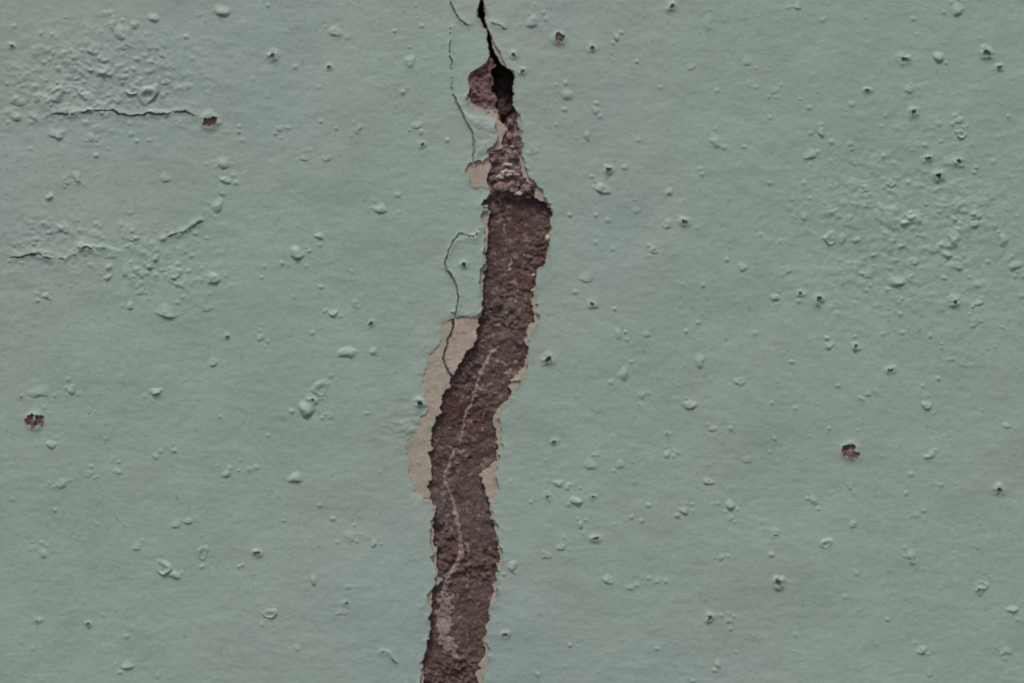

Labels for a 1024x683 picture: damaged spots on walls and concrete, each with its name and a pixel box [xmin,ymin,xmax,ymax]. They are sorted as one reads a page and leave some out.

crack [53,109,194,117]
rust [203,116,218,127]
peeling [465,157,491,189]
crack [10,246,92,260]
crack [392,0,553,683]
peeling [405,312,482,498]
rust [24,413,45,429]
rust [841,444,860,460]
peeling [479,465,499,502]